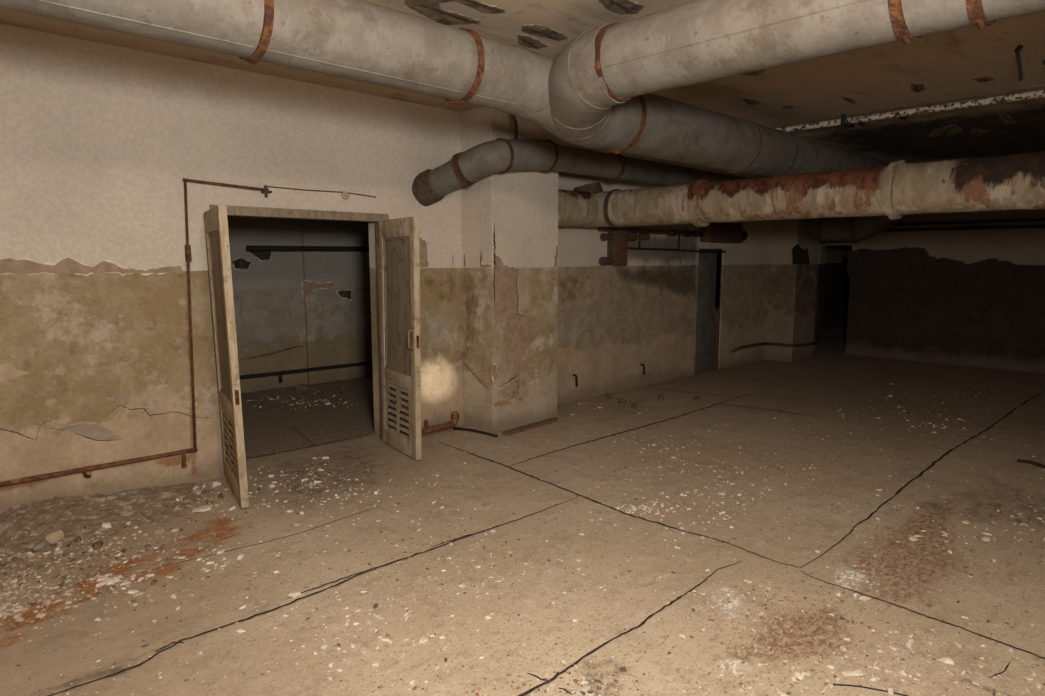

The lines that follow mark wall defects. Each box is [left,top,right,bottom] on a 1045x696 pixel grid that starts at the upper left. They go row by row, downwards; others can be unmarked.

spalling [404,0,505,25]
spalling [598,0,645,15]
peeling [419,236,429,268]
peeling [0,256,183,276]
peeling [480,256,519,326]
crack [111,405,201,418]
crack [1,421,119,441]
corrosion [1,517,240,646]